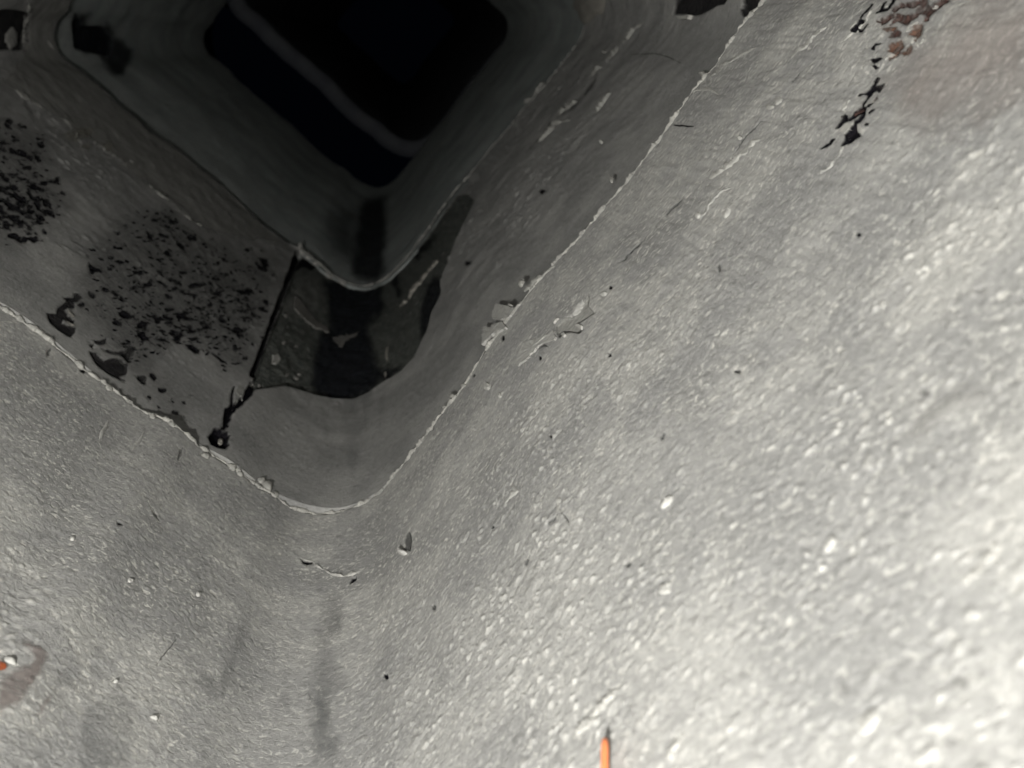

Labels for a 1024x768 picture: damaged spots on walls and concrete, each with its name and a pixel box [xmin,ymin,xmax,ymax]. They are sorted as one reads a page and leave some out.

spalling [0,119,65,245]
spalling [47,195,473,418]